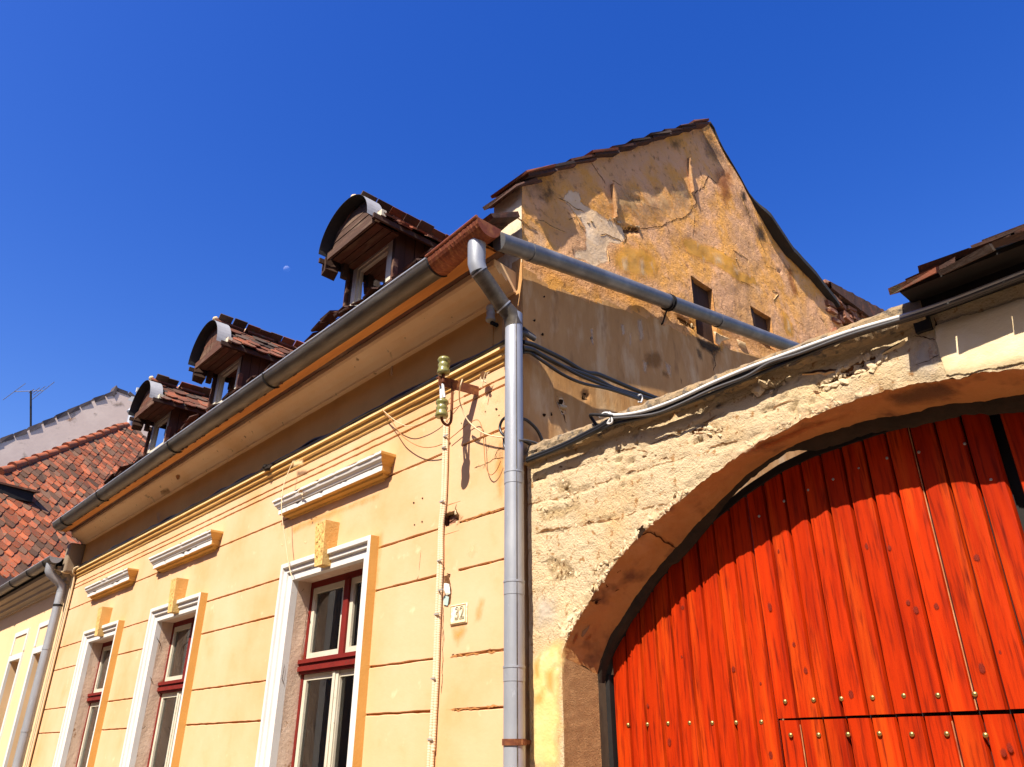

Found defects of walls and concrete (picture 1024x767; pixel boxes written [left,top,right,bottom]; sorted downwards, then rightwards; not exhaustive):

flaking render [564,190,642,266]
crack [641,177,716,232]
spalling [733,352,888,456]
spalling [691,426,723,439]
crack [536,503,676,549]